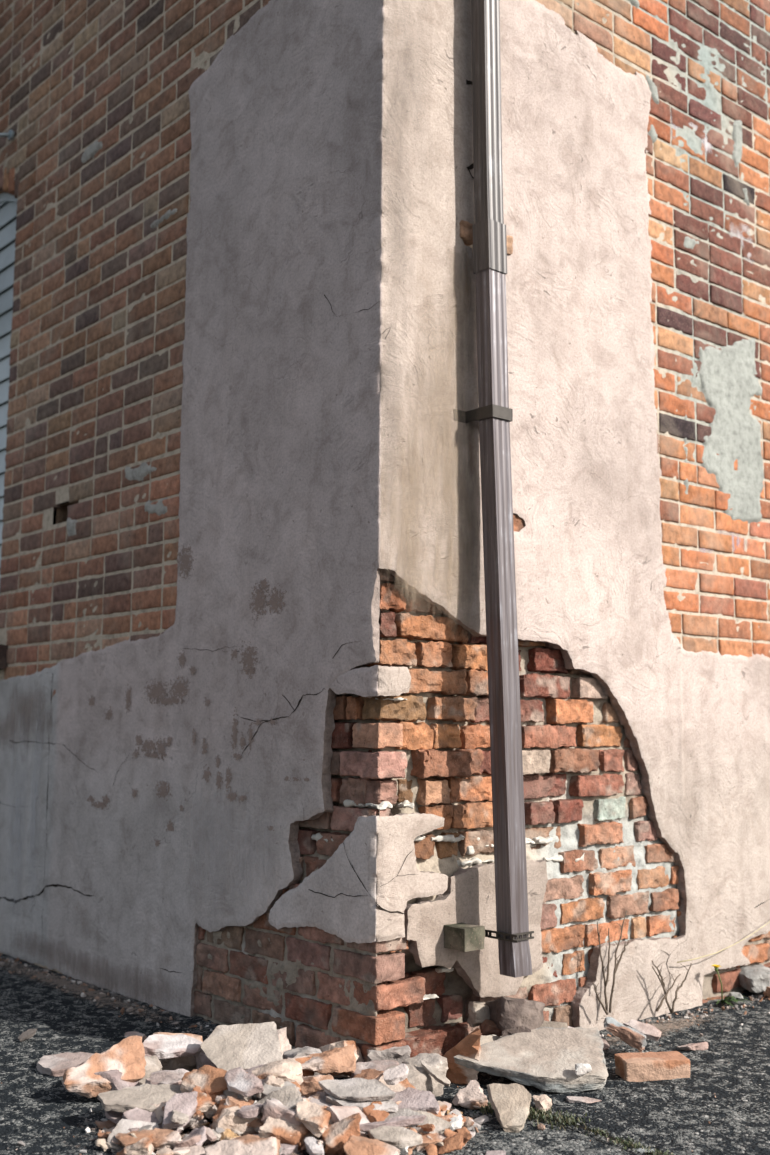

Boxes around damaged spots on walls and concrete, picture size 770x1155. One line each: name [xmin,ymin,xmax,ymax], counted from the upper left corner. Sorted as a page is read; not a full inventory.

crack [0,673,129,912]
crack [236,692,320,752]
crack [308,843,412,914]
spalling [61,569,681,1155]